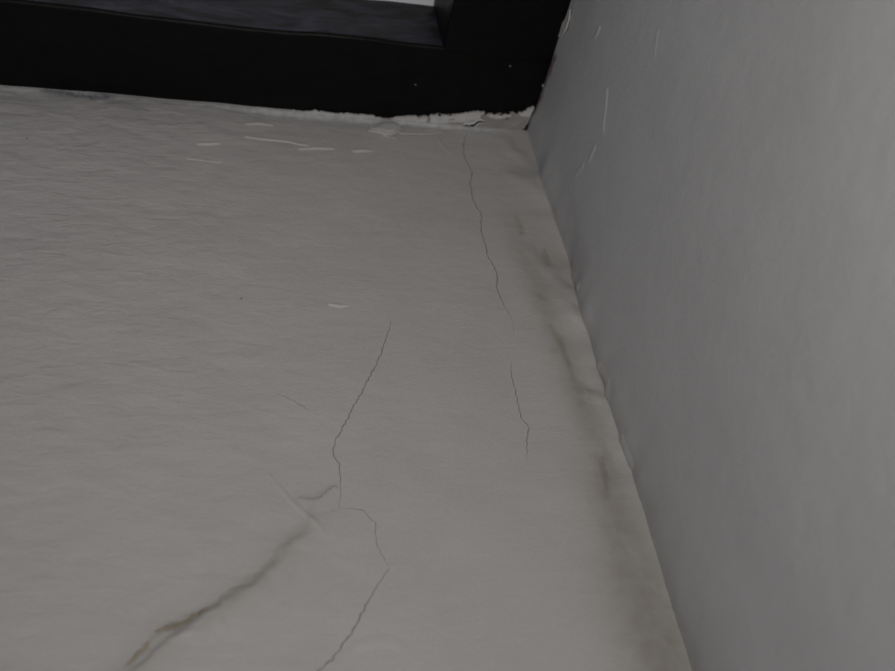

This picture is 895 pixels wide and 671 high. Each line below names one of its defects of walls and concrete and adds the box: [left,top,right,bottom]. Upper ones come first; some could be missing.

crack [448,118,514,335]
crack [298,321,391,671]
crack [510,365,530,463]